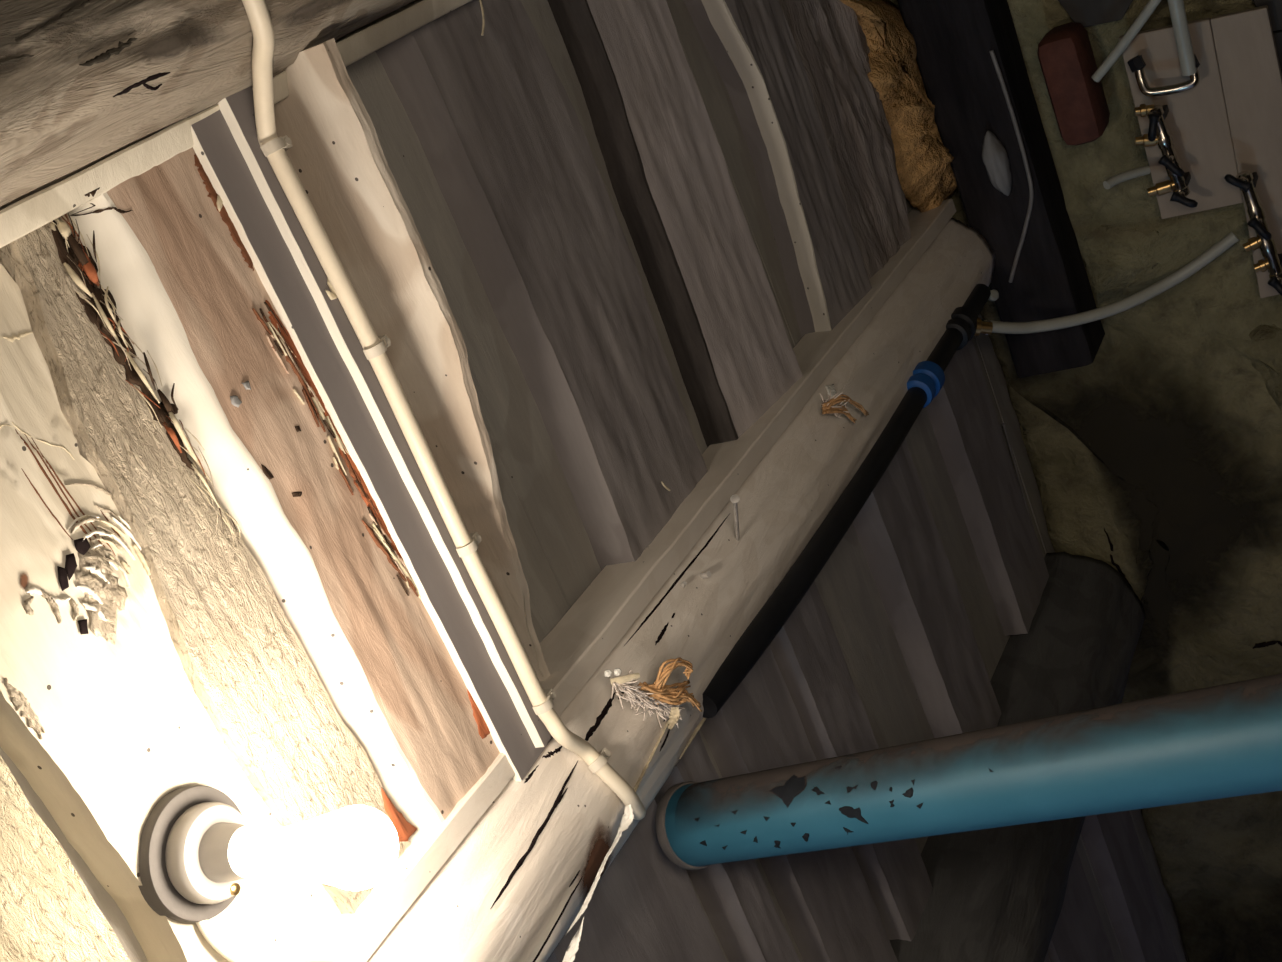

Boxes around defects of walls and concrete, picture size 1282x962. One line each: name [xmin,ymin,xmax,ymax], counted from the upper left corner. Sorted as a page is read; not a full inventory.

crack [490,692,624,909]
peeling [770,775,825,808]
peeling [839,781,914,835]